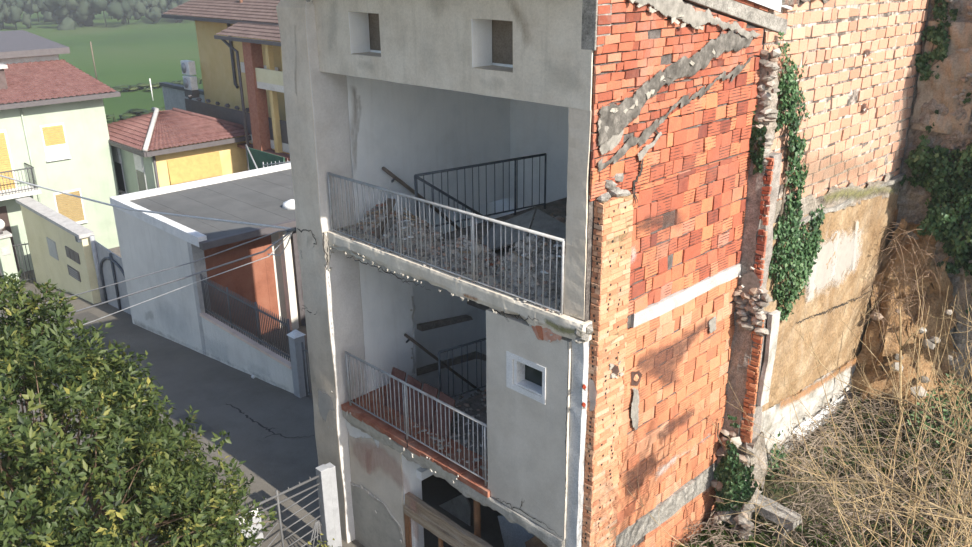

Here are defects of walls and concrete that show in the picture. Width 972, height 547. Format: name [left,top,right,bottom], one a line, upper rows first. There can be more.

flaking render [629,0,761,39]
peeling [610,75,666,113]
peeling [529,324,562,342]
crack [226,404,314,438]
spalling [316,391,459,483]